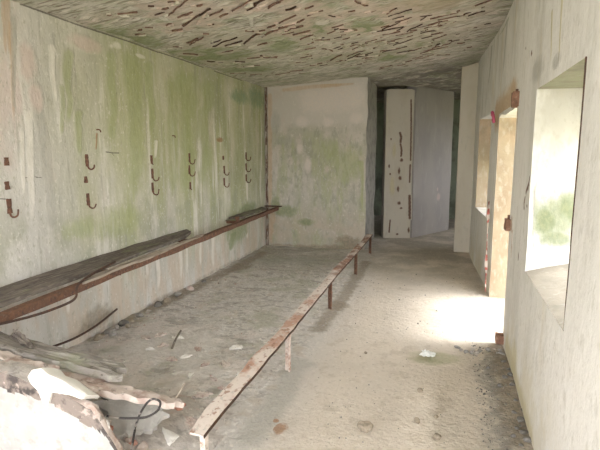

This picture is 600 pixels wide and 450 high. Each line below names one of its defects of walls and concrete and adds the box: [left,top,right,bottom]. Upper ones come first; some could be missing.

water stain [63,32,118,144]
rust [388,99,413,234]